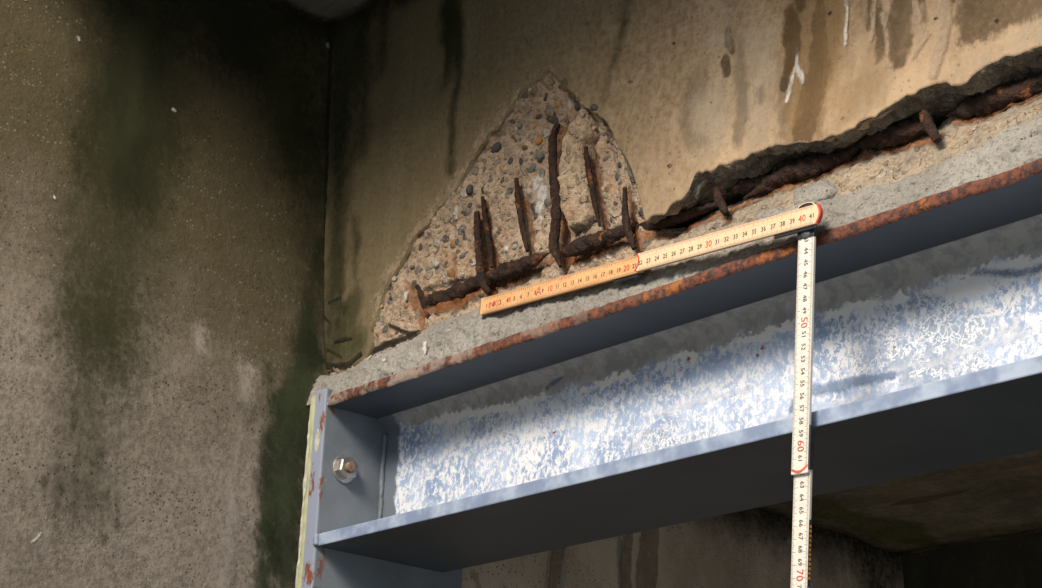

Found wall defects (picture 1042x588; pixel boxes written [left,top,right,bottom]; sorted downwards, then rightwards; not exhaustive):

damp [440,0,461,171]
damp [721,26,734,77]
damp [779,0,828,142]
damp [866,0,1042,77]
spalling [369,65,649,356]
rust [405,133,943,331]
damp [255,523,276,588]